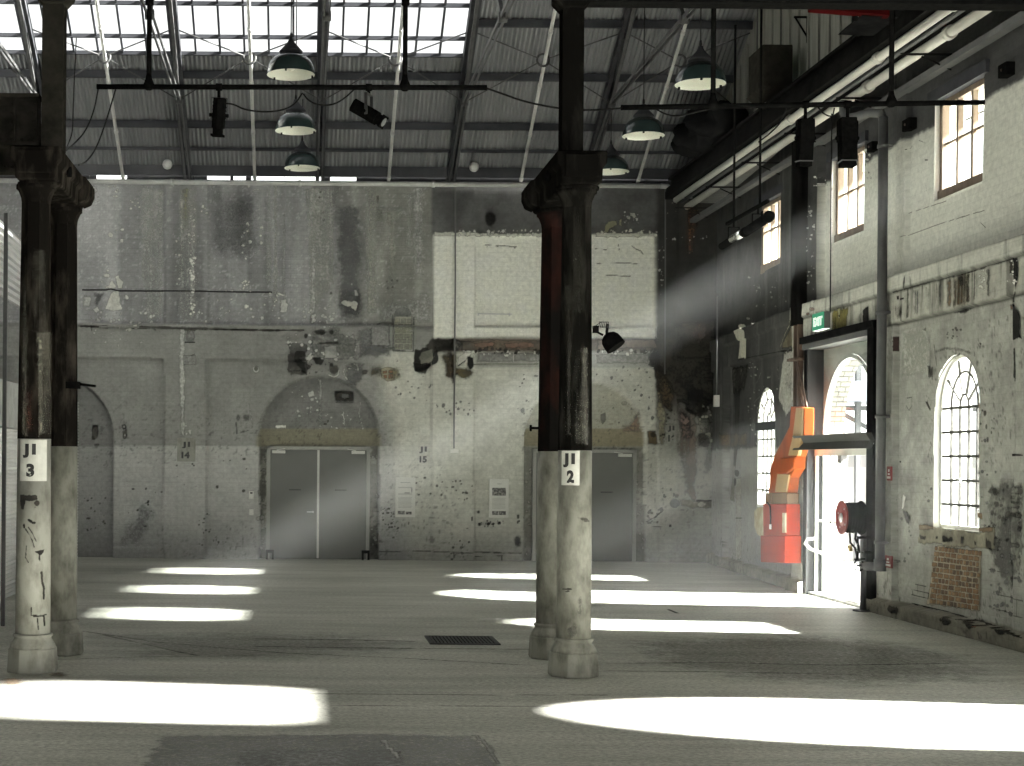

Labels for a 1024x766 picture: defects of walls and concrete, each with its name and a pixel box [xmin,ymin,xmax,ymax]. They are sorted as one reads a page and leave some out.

water stain [306,188,430,322]
flaking render [286,283,363,429]
flaking render [371,307,475,415]
flaking render [927,546,1010,635]
water stain [988,483,1024,616]